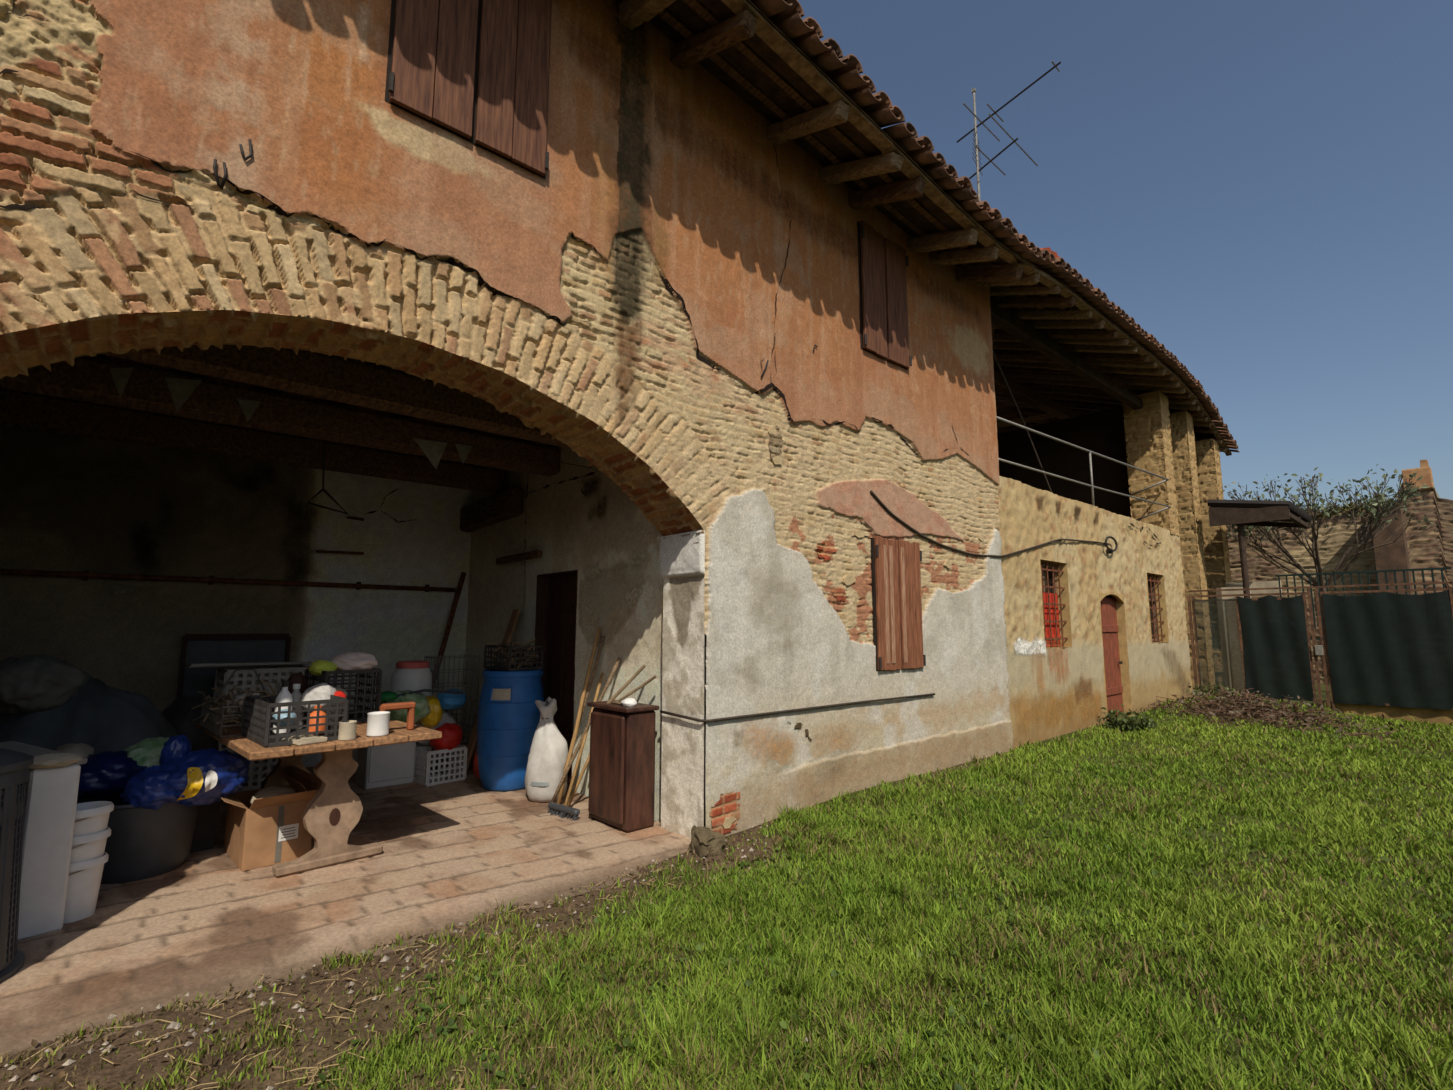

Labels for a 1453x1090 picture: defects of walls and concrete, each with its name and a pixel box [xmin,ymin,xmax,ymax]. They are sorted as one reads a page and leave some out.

crack [0,202,41,210]
peeling [0,0,345,231]
peeling [439,255,477,276]
crack [571,231,608,267]
damp [608,0,666,418]
crack [651,144,970,460]
peeling [533,228,1002,645]